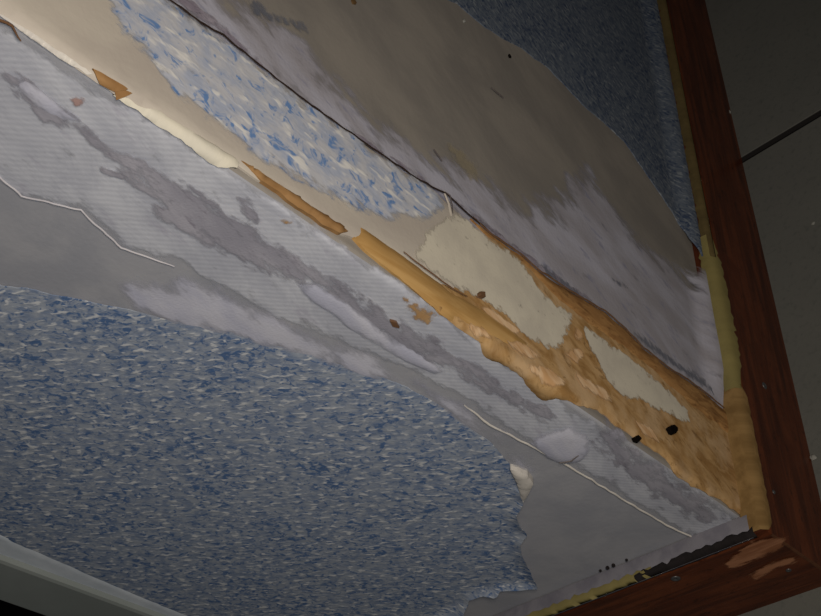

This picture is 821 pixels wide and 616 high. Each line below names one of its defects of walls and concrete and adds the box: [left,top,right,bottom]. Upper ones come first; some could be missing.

damp [2,73,553,420]
crack [169,0,485,227]
spalling [0,14,772,532]
damp [657,0,742,392]
peeling [0,535,186,616]
damp [591,418,724,523]